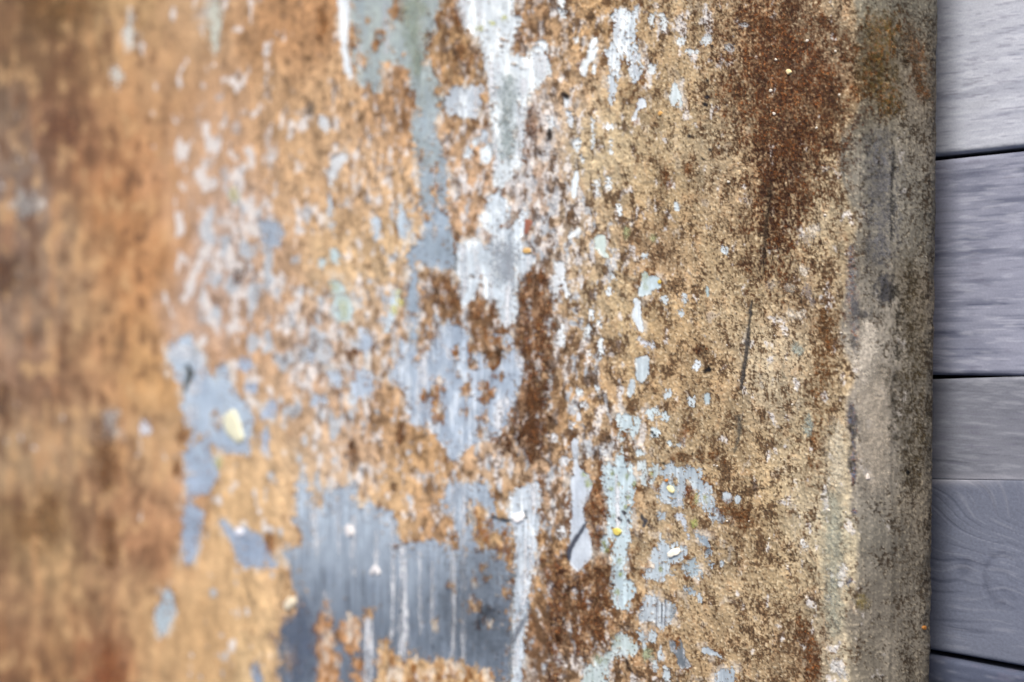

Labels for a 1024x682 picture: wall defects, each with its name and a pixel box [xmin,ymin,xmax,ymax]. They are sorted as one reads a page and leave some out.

peeling [166,332,279,568]
peeling [219,472,542,682]
peeling [306,0,552,464]
peeling [550,261,571,348]
peeling [581,631,640,682]
peeling [580,5,644,106]
peeling [627,271,661,398]
peeling [568,410,741,669]
peeling [658,83,686,116]
corrosion [696,0,931,301]
water stain [851,299,893,490]
water stain [855,129,902,304]